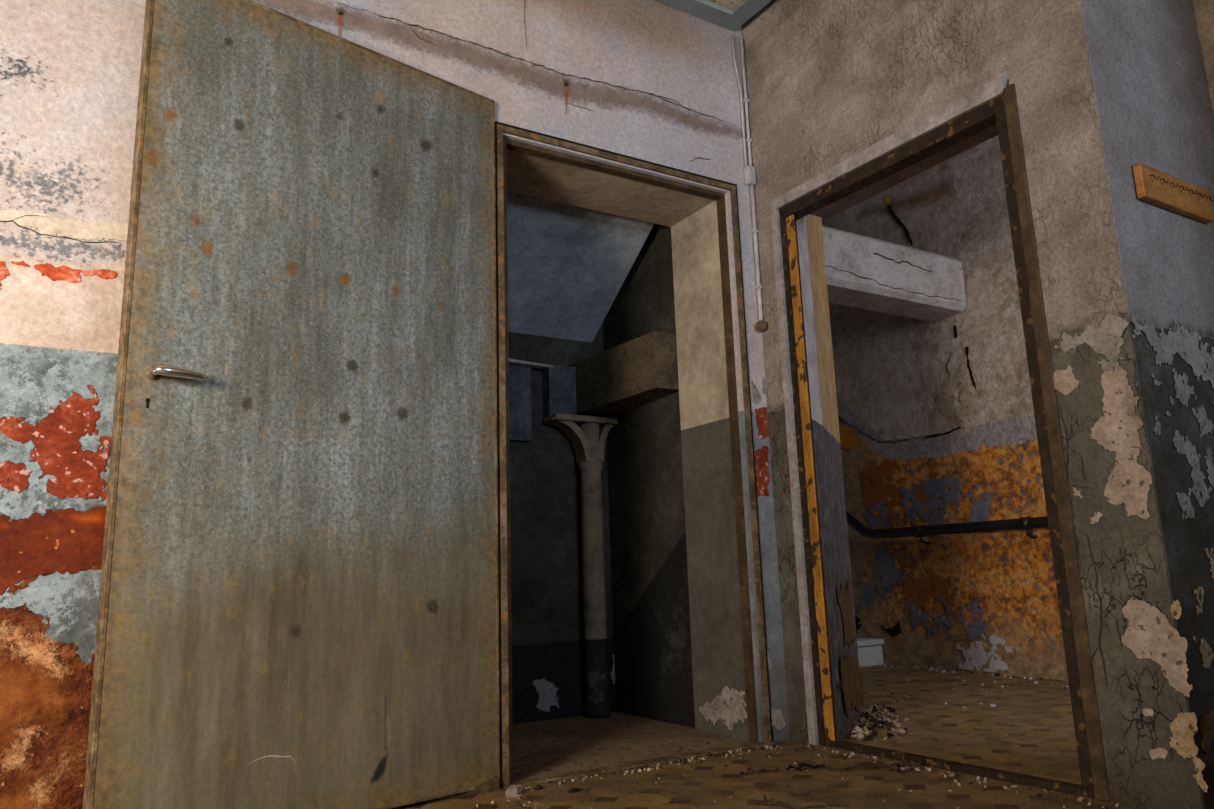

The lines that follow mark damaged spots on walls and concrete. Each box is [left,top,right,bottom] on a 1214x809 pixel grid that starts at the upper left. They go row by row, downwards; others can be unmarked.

crack [333,0,738,126]
peeling [0,260,117,290]
crack [0,215,123,243]
peeling [0,209,128,241]
crack [825,195,976,404]
peeling [1053,313,1214,524]
peeling [0,384,112,809]
peeling [836,469,992,648]
peeling [881,594,1013,672]
peeling [1121,547,1214,697]
peeling [699,686,747,730]
peeling [1150,709,1214,792]